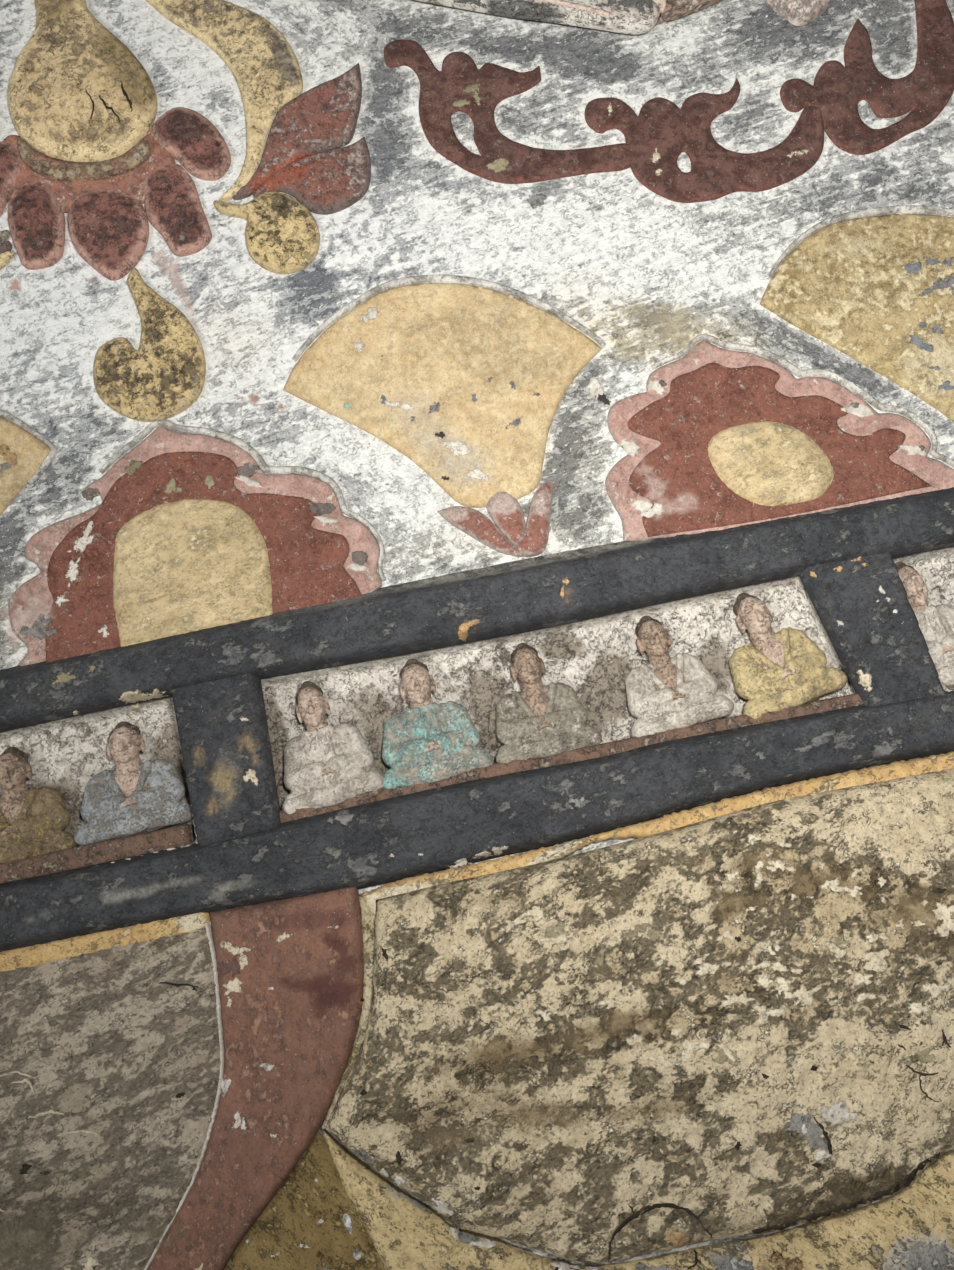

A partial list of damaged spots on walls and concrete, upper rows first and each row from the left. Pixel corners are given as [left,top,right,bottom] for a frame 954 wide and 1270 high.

peeling [904,257,954,298]
peeling [906,322,954,392]
peeling [0,444,18,474]
peeling [164,478,182,494]
peeling [13,521,98,642]
crack [608,1203,712,1270]